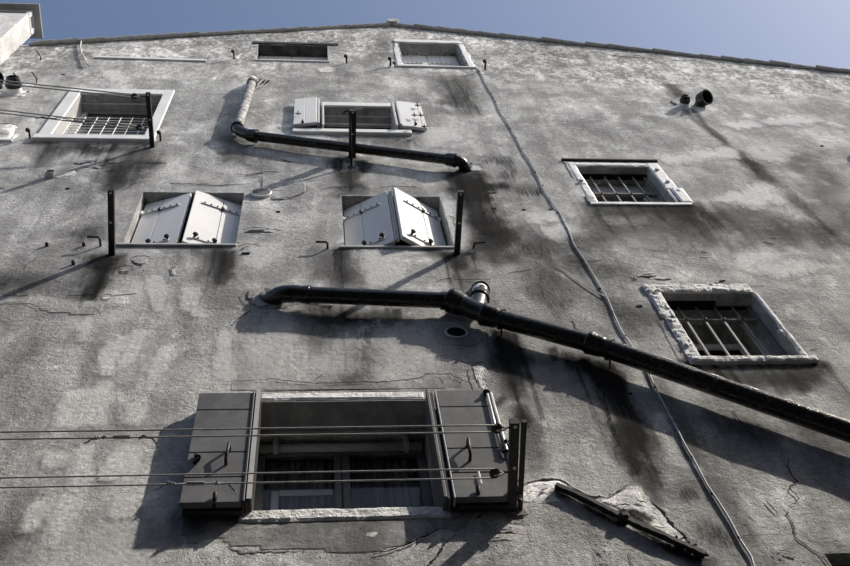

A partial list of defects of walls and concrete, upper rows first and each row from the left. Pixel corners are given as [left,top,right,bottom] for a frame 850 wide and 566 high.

damp [414,125,463,147]
damp [442,172,508,280]
damp [525,211,582,240]
damp [586,204,694,250]
spalling [471,362,486,390]
damp [488,329,535,396]
damp [571,356,650,461]
spalling [523,477,707,561]
crack [767,457,830,566]